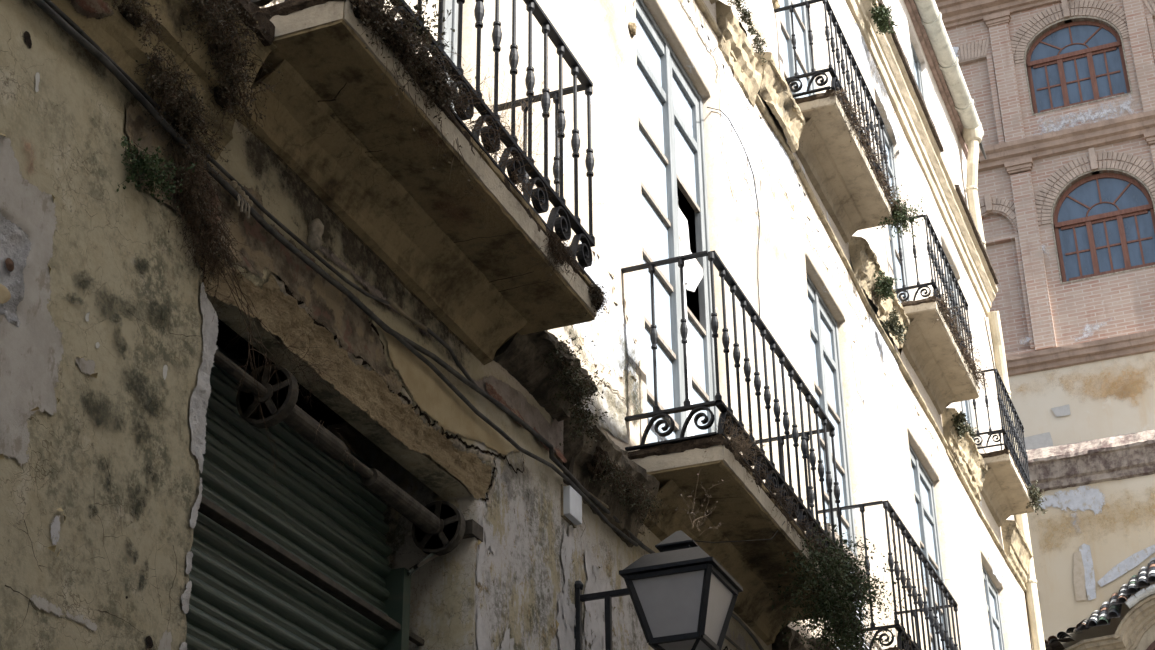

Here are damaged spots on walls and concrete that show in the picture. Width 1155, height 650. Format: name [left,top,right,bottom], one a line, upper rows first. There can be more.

peeling [625,0,637,36]
peeling [0,133,100,466]
mould [67,272,170,443]
flaking render [125,100,519,529]
crack [275,275,524,507]
flaking render [415,325,567,463]
peeling [572,250,641,443]
peeling [681,0,920,415]
flaking render [181,551,193,614]